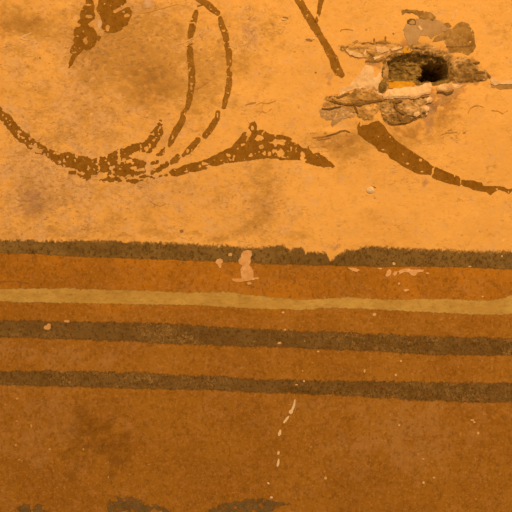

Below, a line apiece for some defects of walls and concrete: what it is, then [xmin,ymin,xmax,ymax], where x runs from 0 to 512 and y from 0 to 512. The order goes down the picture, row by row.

spalling [319,9,512,126]
peeling [232,250,259,285]
peeling [378,262,429,277]